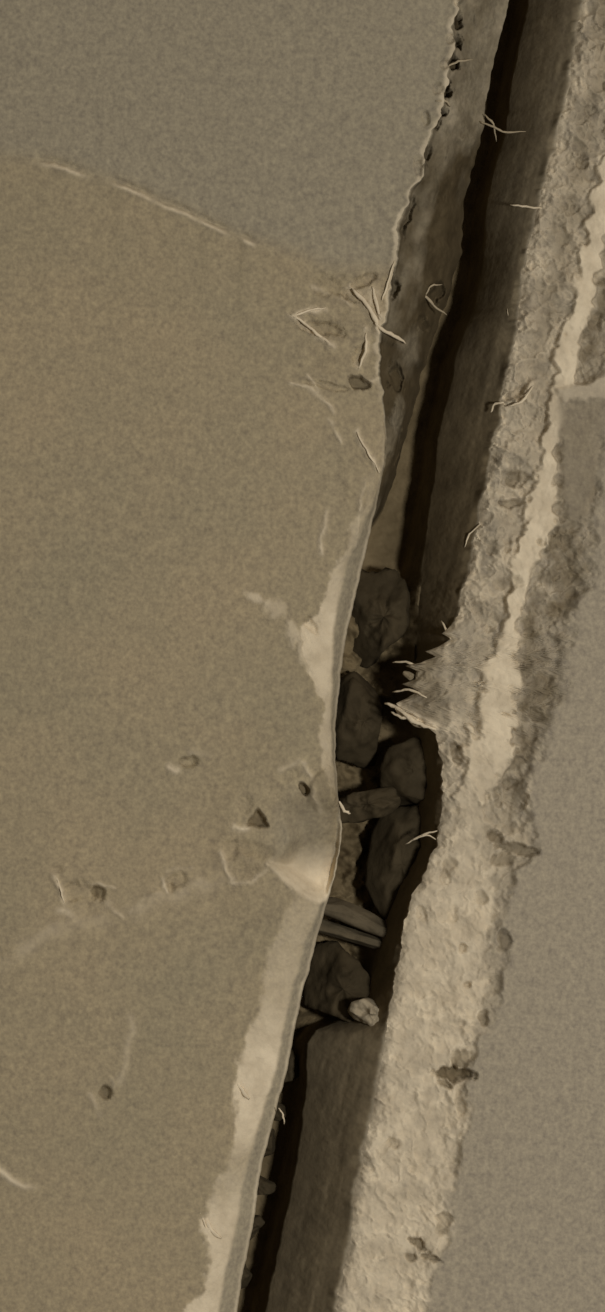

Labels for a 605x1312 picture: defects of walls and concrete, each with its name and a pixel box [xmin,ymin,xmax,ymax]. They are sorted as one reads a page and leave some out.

peeling [239,261,406,763]
crack [237,0,585,1312]
spalling [336,0,605,1312]